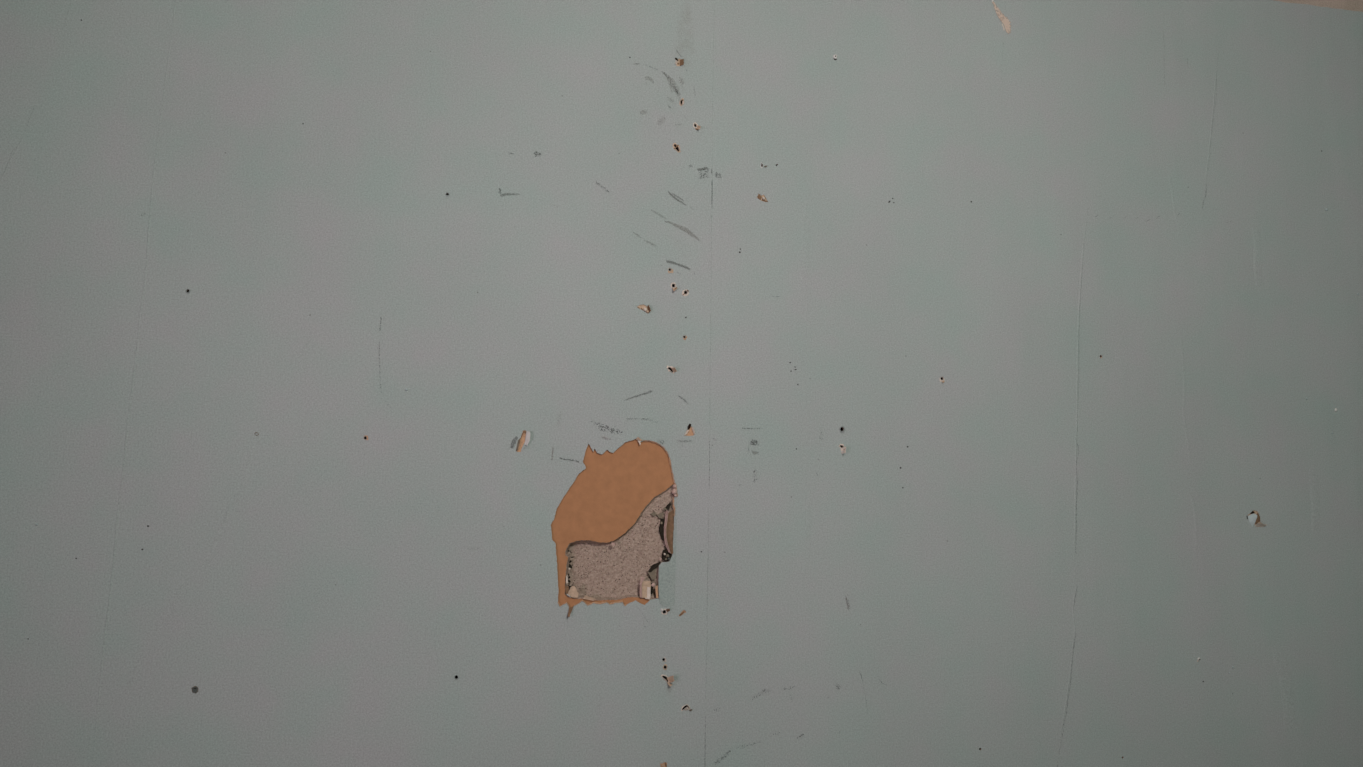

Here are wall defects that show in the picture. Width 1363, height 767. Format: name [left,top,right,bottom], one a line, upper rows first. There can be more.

spalling [516,430,530,452]
peeling [551,437,678,618]